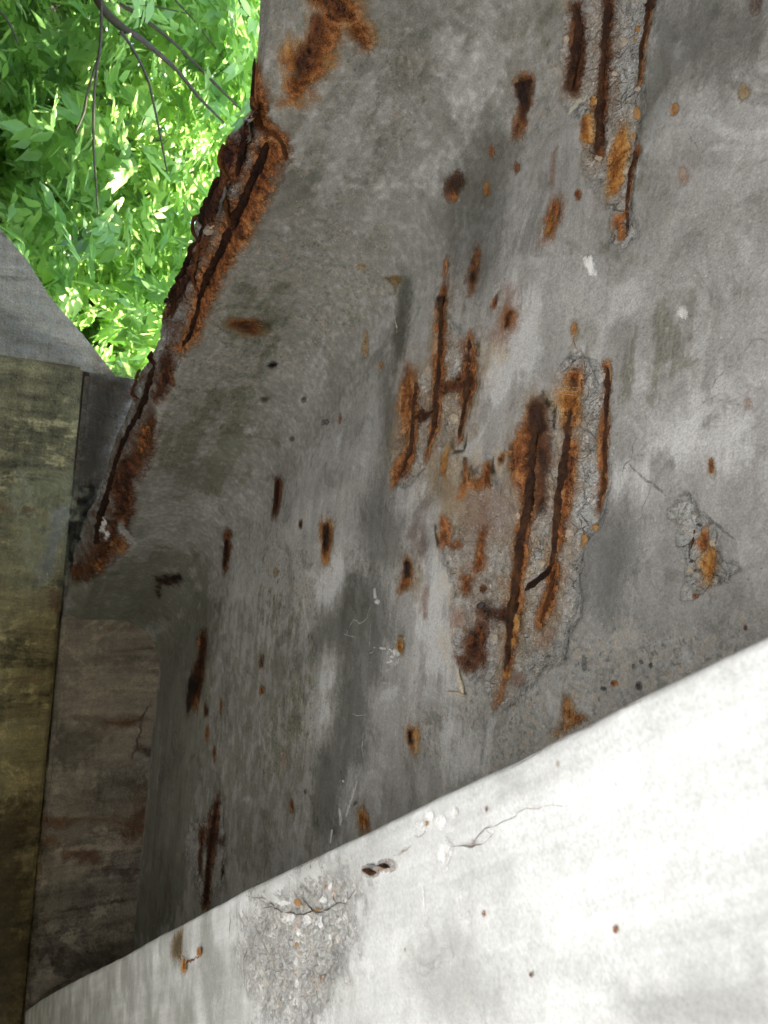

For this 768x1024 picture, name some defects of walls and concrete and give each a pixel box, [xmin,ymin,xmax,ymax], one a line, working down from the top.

rust [277,0,378,109]
spalling [560,0,656,248]
rust [539,190,581,243]
rust [465,246,481,297]
rust [227,318,268,335]
rust [319,518,334,568]
spalling [437,352,612,715]
spalling [668,492,741,601]
crack [452,805,563,848]
spalling [239,859,395,1024]